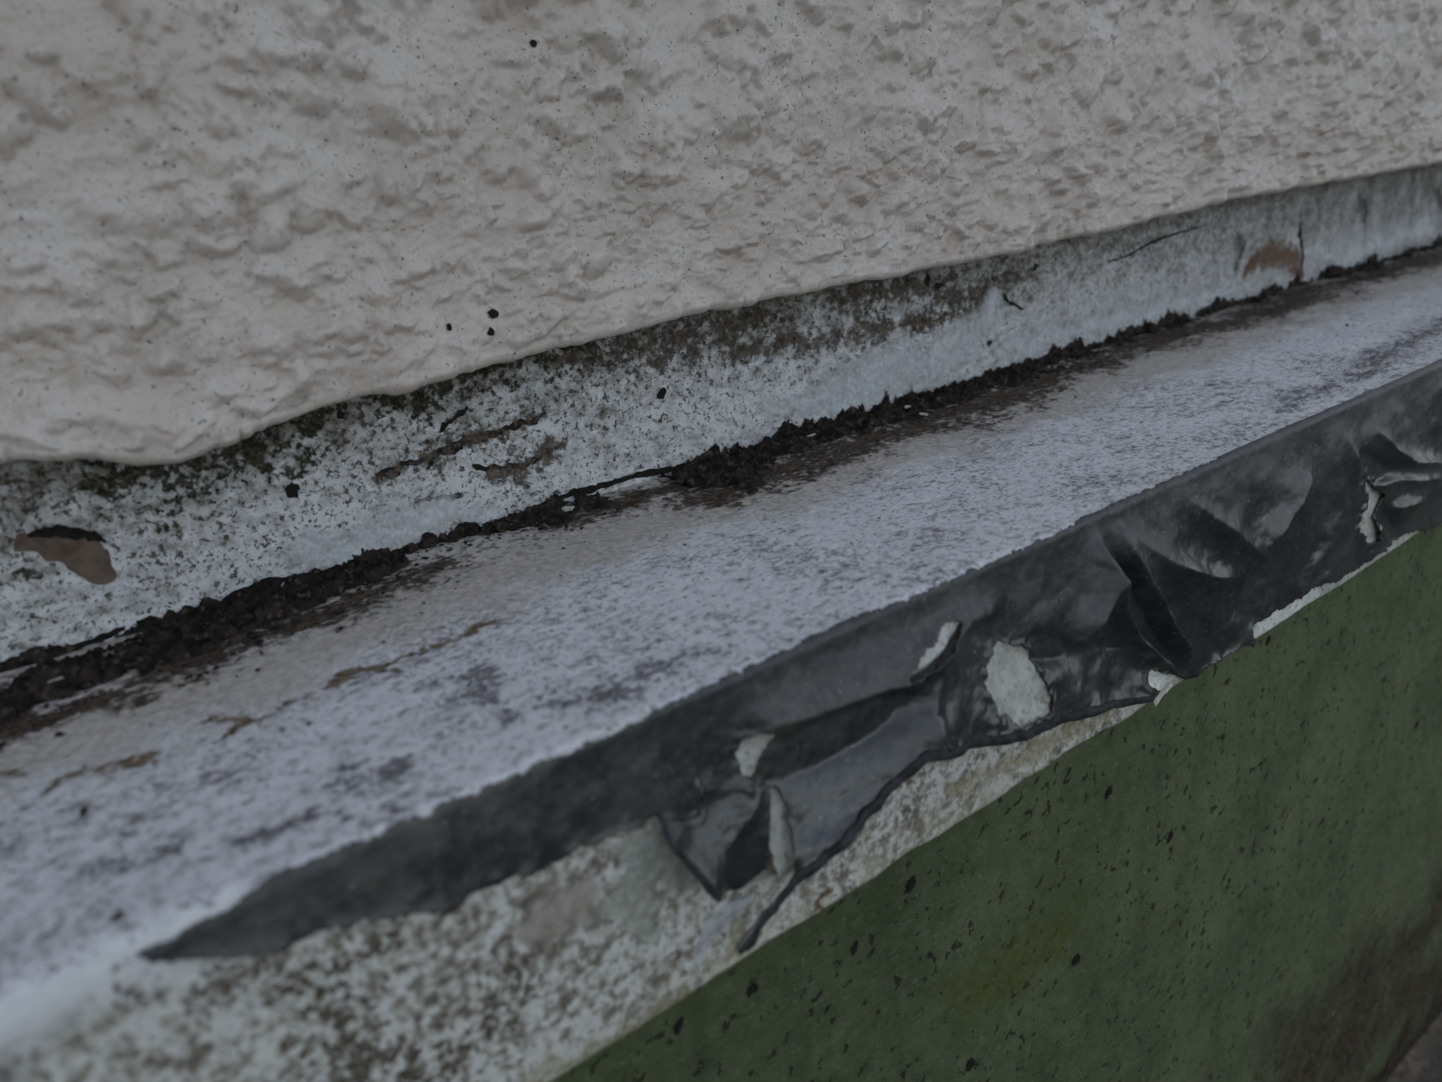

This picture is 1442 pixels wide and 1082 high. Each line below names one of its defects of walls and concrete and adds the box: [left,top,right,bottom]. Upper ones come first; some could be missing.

spalling [487,308,499,336]
spalling [905,274,943,291]
damp [0,259,1442,798]
peeling [136,359,1442,963]
damp [228,749,426,855]
damp [1380,1011,1442,1082]